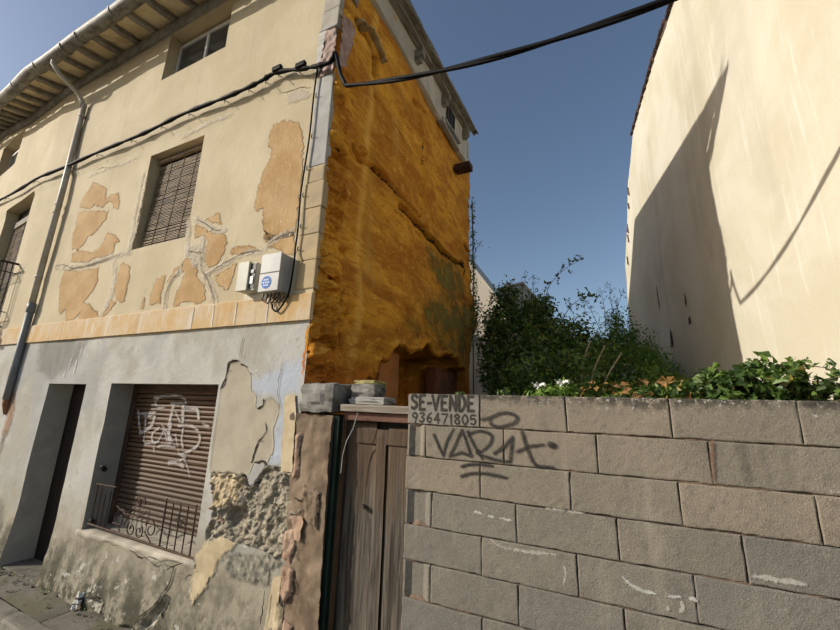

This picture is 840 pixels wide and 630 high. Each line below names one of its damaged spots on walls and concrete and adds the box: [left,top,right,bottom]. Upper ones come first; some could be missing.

spalling [316,14,355,77]
peeling [254,119,304,256]
peeling [58,182,130,321]
peeling [140,213,256,309]
crack [220,336,252,389]
crack [251,361,283,484]
spalling [374,339,466,406]
spalling [190,362,321,630]